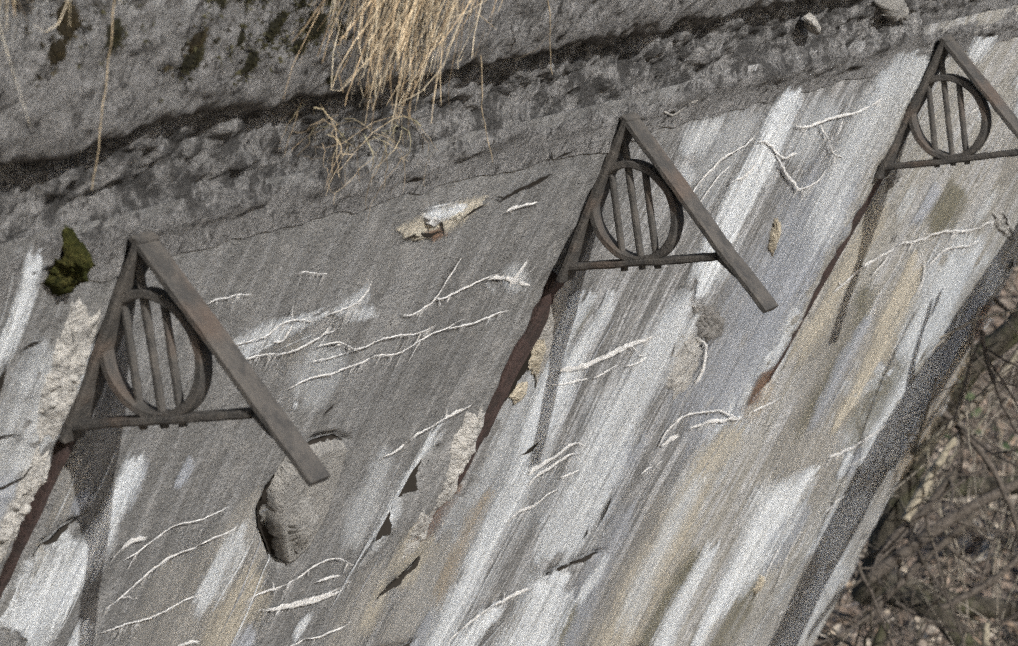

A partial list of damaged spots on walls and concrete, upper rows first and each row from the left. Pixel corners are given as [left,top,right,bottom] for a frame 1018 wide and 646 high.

crack [693,97,884,201]
leakage [0,249,42,366]
leakage [0,455,147,646]
crack [102,474,277,633]
leakage [171,489,269,646]
spalling [265,438,348,563]
leakage [325,425,441,646]
crack [236,257,534,445]
crack [504,440,583,532]
leakage [383,238,729,646]
crack [536,336,656,390]
leakage [594,50,1009,646]